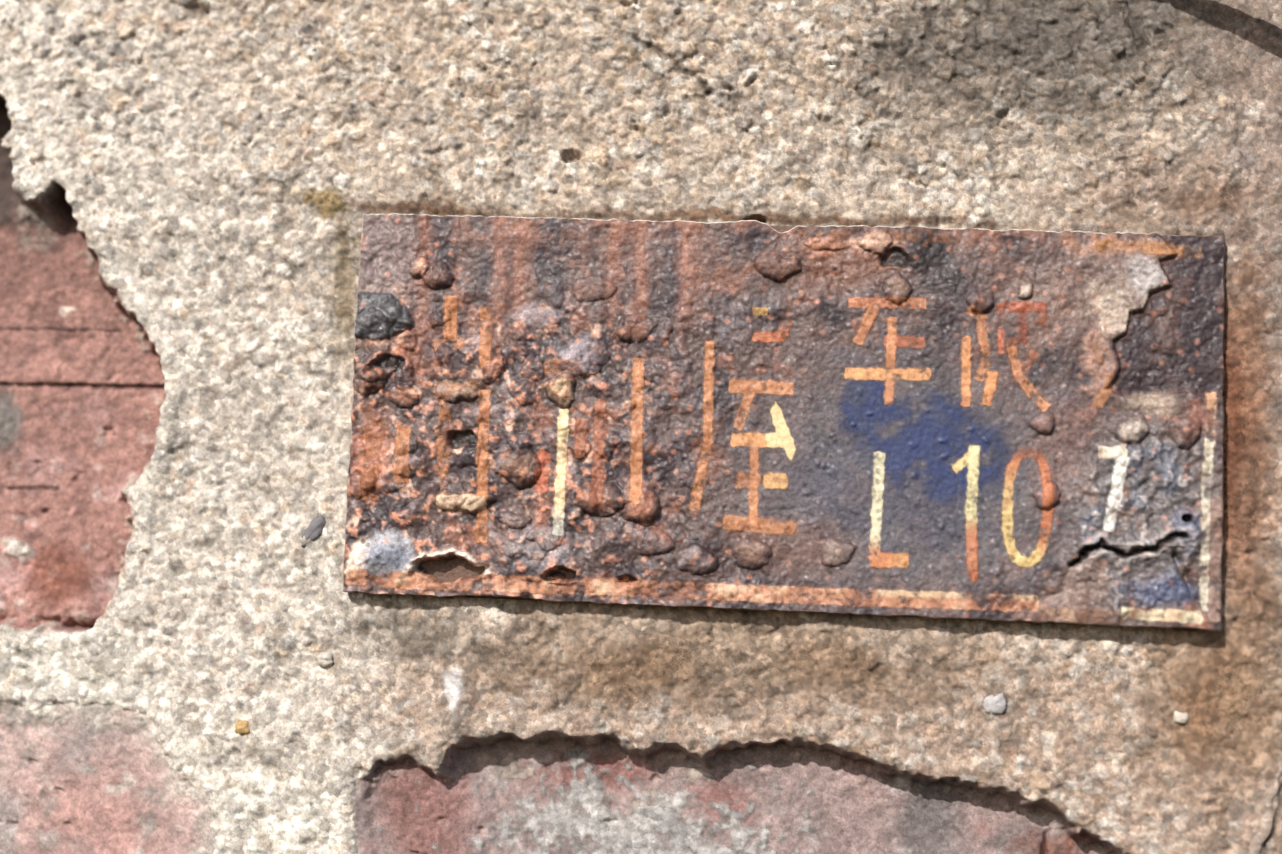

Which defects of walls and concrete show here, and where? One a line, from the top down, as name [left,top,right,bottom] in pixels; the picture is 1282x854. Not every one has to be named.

rust [359,199,501,217]
rust [563,207,990,227]
spalling [0,214,167,635]
rust [1222,307,1270,600]
spalling [0,701,220,854]
spalling [350,730,1129,854]
crack [1264,787,1282,849]